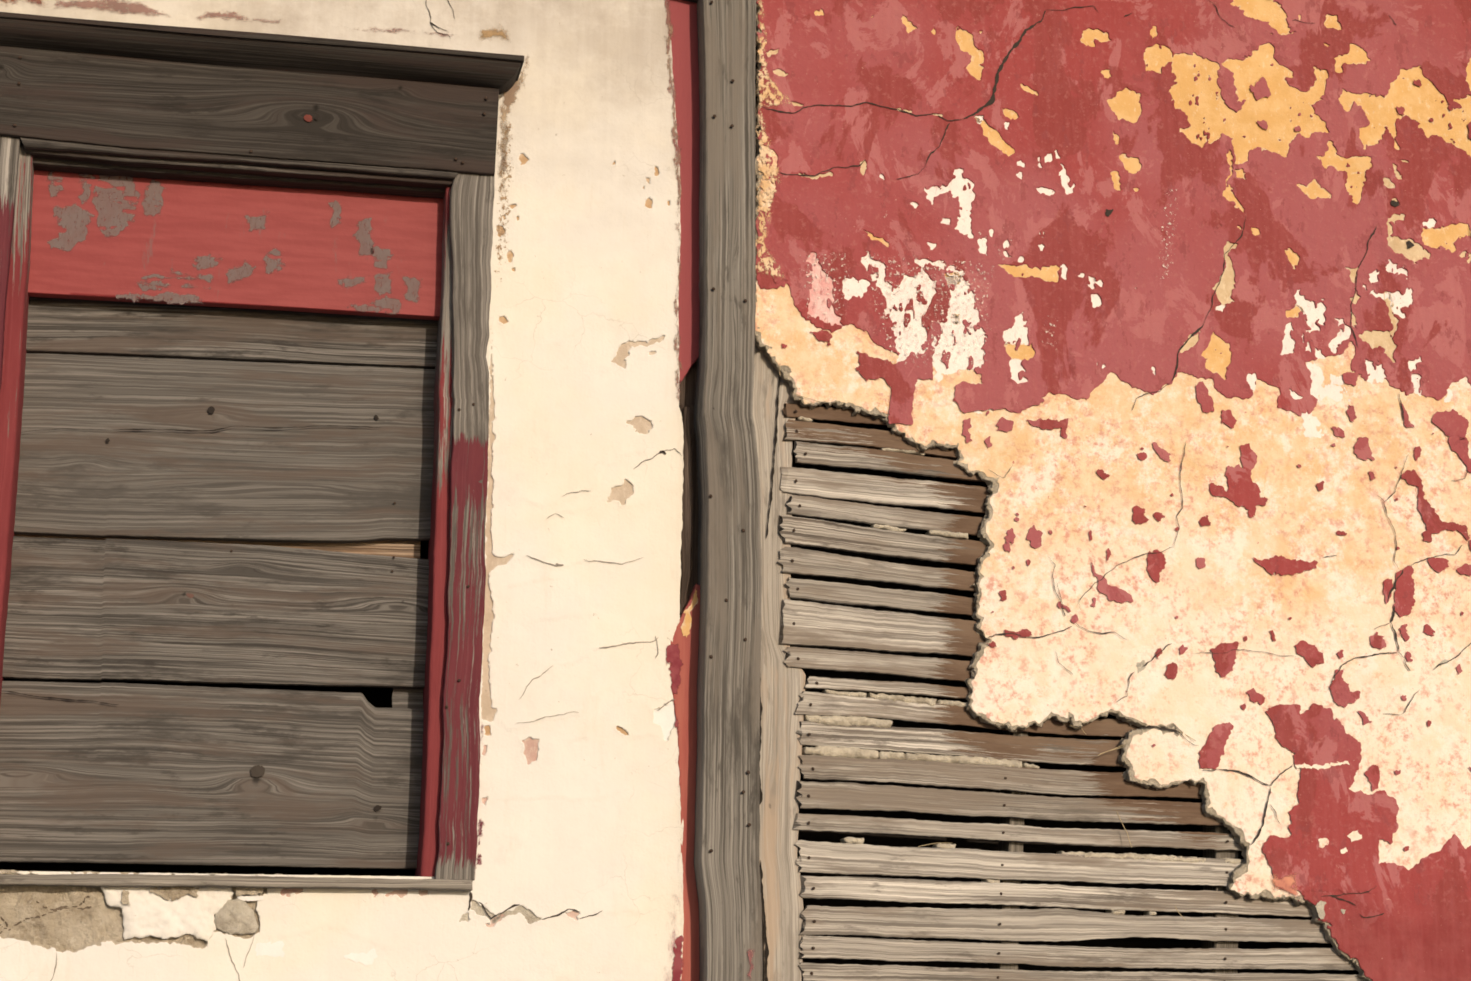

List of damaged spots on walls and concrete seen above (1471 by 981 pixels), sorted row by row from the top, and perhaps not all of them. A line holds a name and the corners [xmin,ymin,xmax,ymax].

crack [426,1,455,39]
crack [757,6,1132,180]
peeling [755,0,1471,920]
spalling [420,541,429,559]
spalling [4,678,393,708]
spalling [0,862,428,951]
crack [459,892,602,927]
spalling [803,935,990,943]
spalling [1019,937,1202,949]
spalling [1238,941,1333,949]
spalling [802,958,989,981]
spalling [1018,964,1201,973]